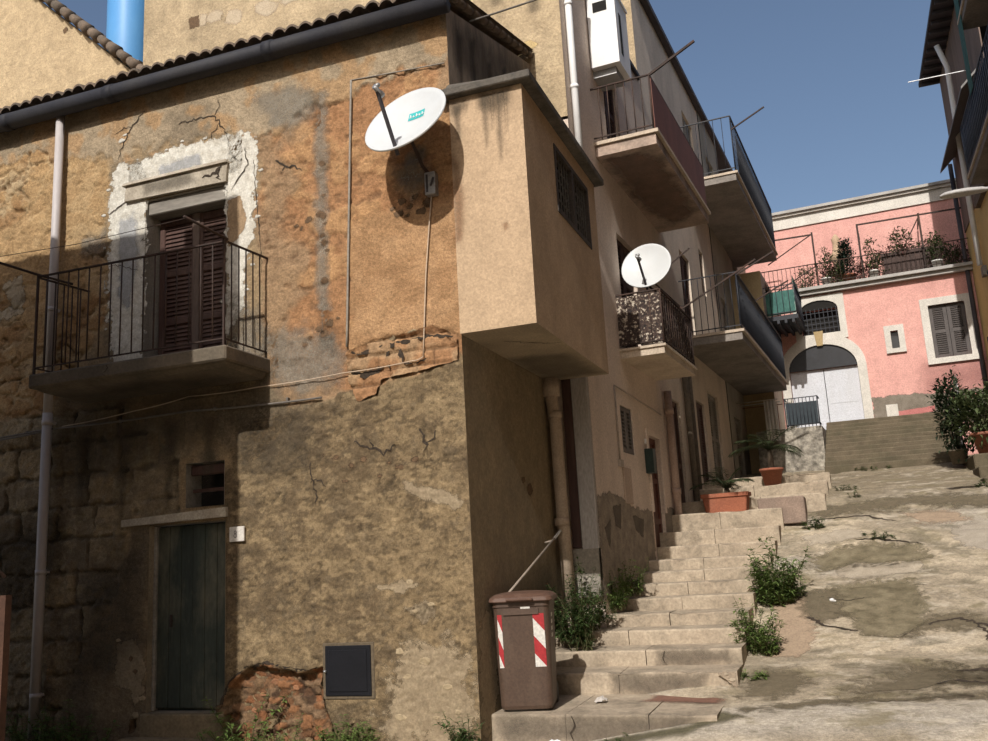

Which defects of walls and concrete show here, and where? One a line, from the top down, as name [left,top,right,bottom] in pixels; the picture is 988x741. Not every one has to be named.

crack [116,111,145,159]
crack [179,102,229,142]
crack [202,165,222,180]
peeling [102,130,263,362]
flaking render [346,325,458,402]
flaking render [216,661,336,741]